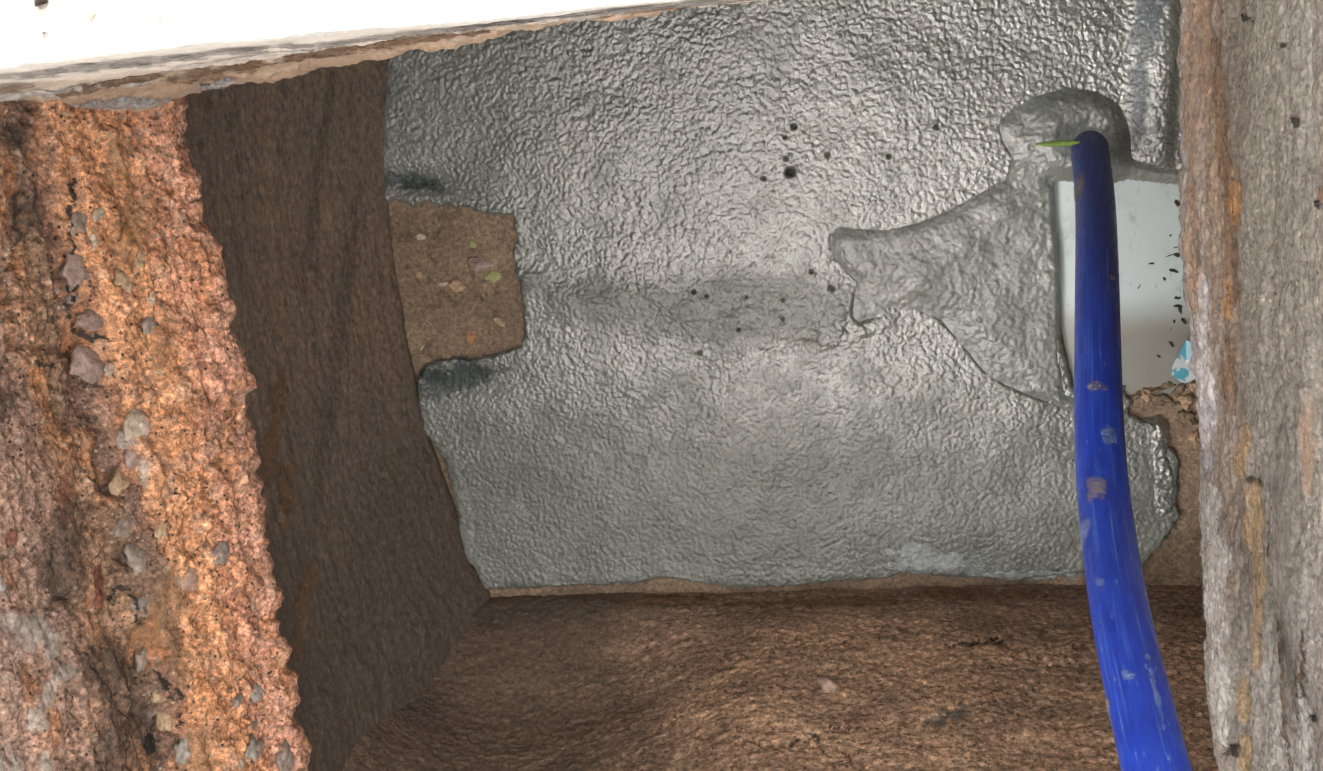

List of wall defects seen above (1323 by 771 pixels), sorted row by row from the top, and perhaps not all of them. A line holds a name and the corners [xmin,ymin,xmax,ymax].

damp [0,0,754,101]
spalling [439,241,501,292]